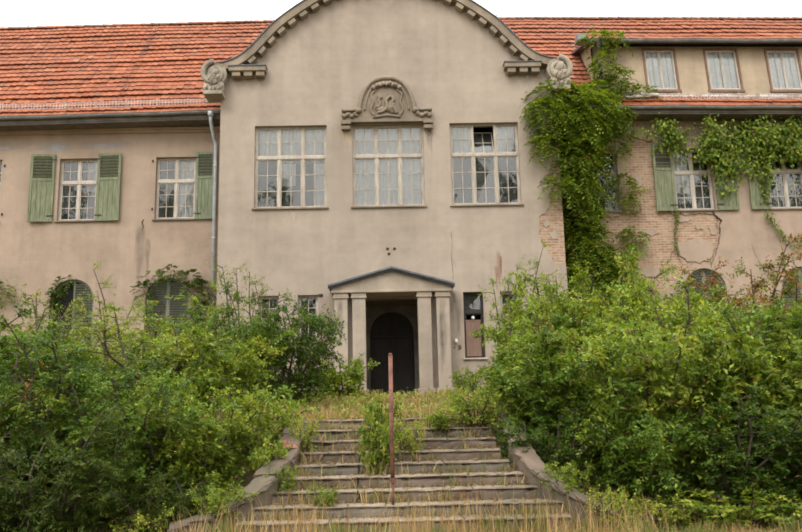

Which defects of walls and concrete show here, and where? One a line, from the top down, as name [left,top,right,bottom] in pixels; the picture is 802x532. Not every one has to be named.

spalling [539,164,566,265]
spalling [578,138,722,295]
crack [711,211,722,268]